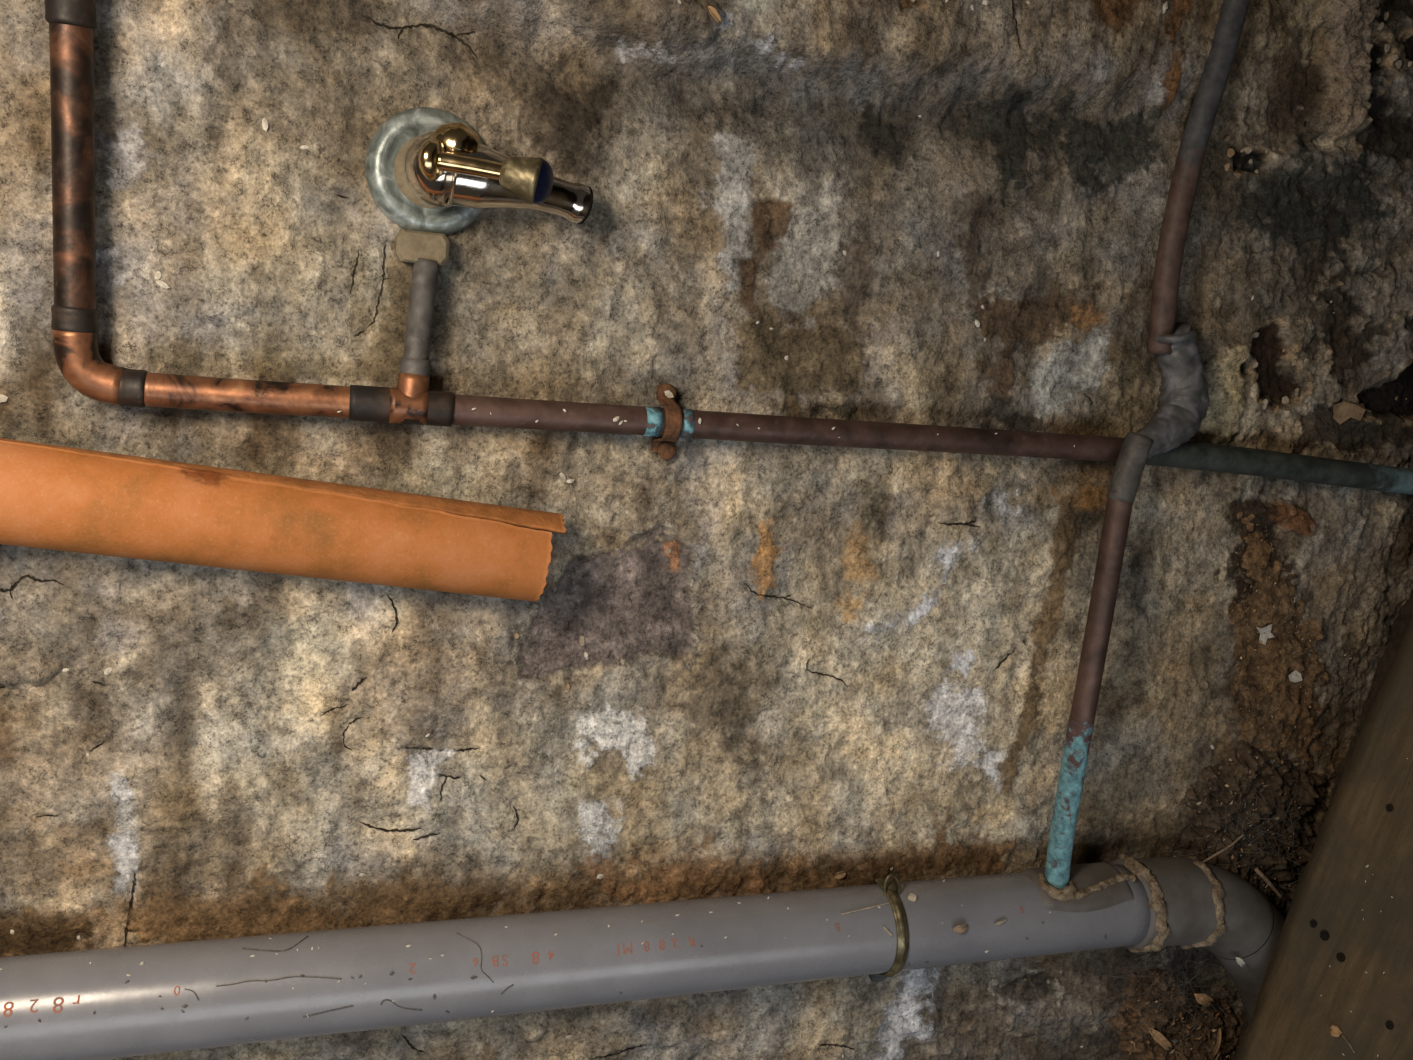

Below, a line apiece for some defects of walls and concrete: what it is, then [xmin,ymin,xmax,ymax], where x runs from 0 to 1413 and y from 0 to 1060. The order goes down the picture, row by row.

peeling [1376,12,1413,69]
peeling [1224,136,1269,173]
damp [1237,139,1396,254]
damp [699,132,876,419]
damp [954,81,1162,432]
peeling [1252,362,1299,414]
peeling [1333,401,1365,424]
damp [864,540,976,640]
damp [1214,482,1298,615]
damp [924,497,1078,796]
damp [572,703,655,779]
damp [874,967,939,1060]